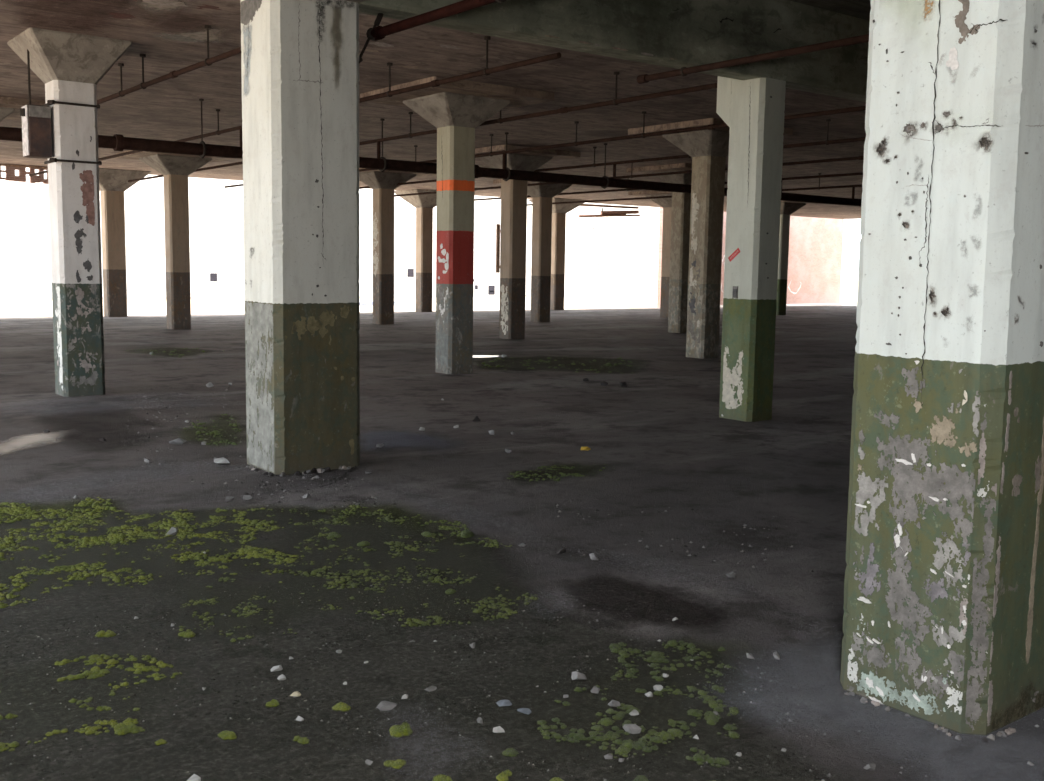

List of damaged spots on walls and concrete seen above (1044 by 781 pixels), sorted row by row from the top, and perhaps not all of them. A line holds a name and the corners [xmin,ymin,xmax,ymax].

peeling [946,0,980,70]
peeling [55,150,99,390]
peeling [722,346,744,416]
peeling [901,353,926,413]
crack [902,0,1001,405]
peeling [847,371,1044,732]